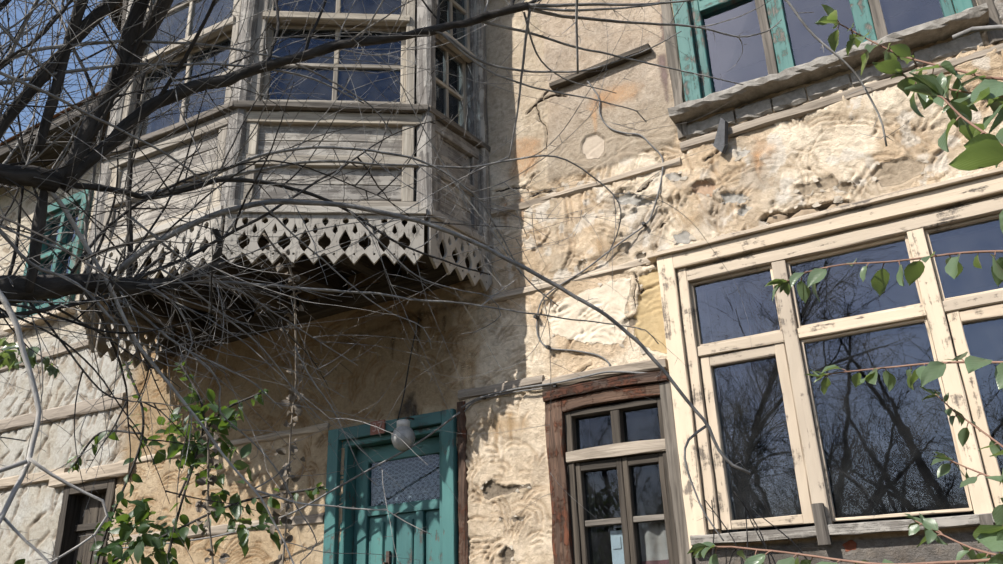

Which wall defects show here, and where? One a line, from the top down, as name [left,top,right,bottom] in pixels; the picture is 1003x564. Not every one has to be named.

crack [527,91,567,149]
flaking render [872,157,928,187]
flaking render [665,171,753,216]
flaking render [760,174,858,224]
flaking render [673,231,696,244]
flaking render [480,480,531,500]
flaking render [499,545,515,564]